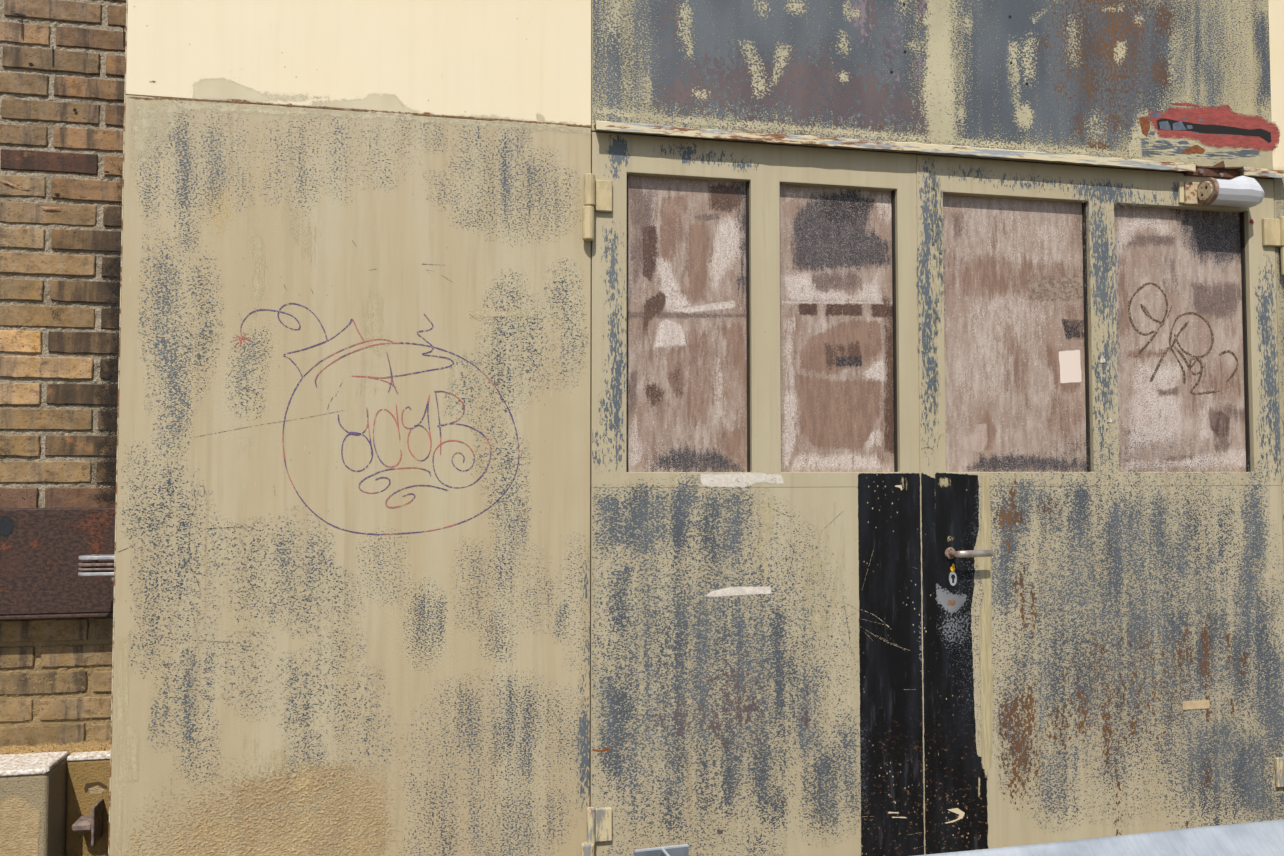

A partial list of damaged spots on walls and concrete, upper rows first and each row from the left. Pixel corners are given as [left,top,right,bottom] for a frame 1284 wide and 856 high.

water stain [104,357,119,431]
peeling [118,101,868,856]
peeling [592,0,1284,833]
rust [990,473,1062,645]
rust [995,615,1249,836]